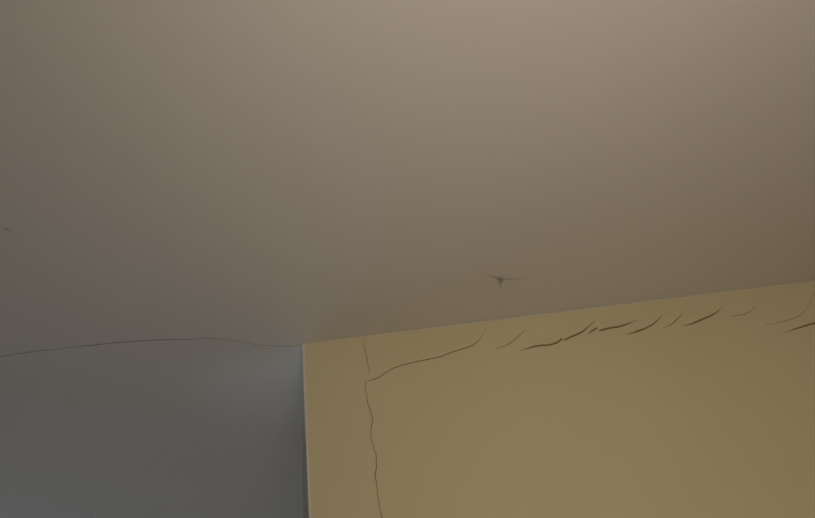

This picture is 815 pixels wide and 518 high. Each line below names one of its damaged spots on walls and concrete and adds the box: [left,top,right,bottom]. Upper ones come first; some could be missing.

crack [360,325,487,518]